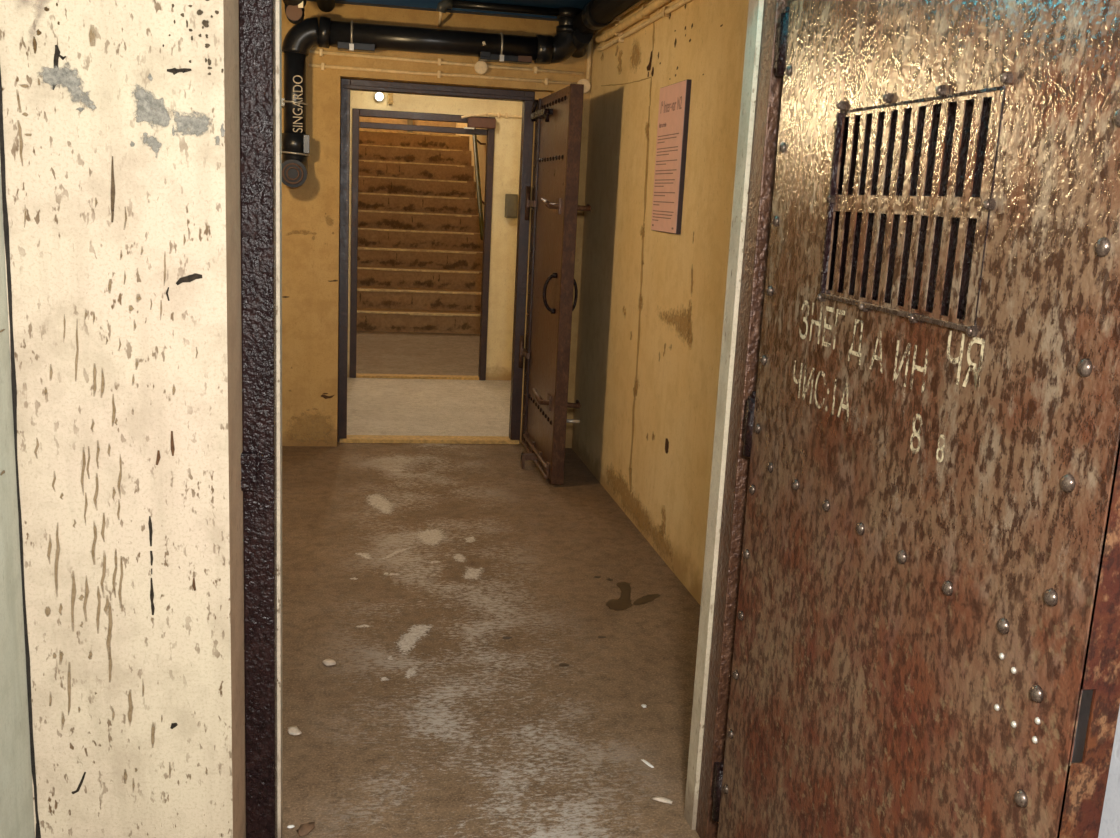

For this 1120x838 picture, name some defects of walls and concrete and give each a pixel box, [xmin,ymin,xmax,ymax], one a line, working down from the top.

spalling [17,62,96,165]
spalling [130,74,225,157]
water stain [594,576,661,611]